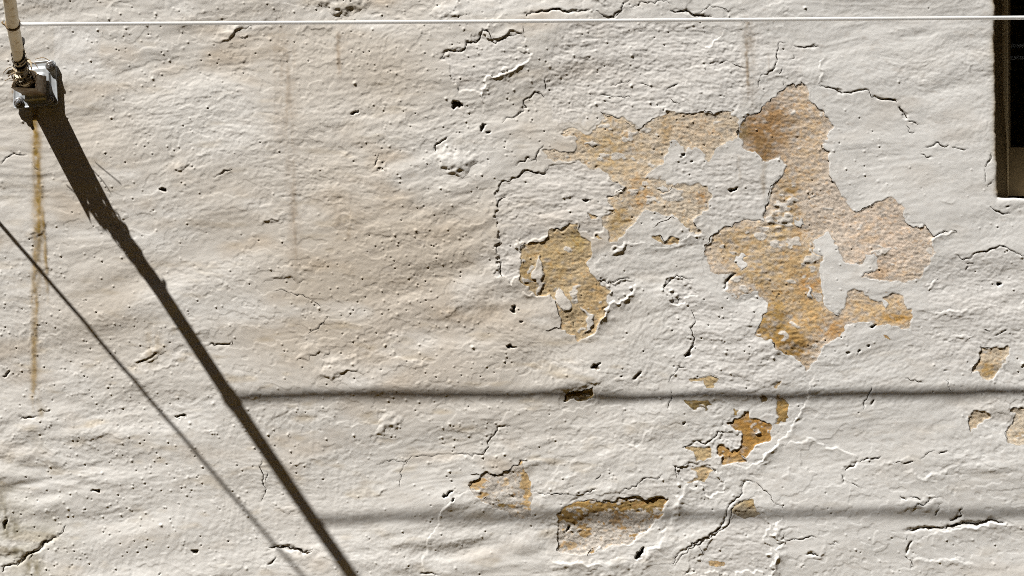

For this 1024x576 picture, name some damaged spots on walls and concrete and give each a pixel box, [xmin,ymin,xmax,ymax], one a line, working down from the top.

crack [441,0,730,58]
crack [821,85,966,158]
rust [33,114,45,233]
peeling [519,82,941,371]
peeling [971,346,1010,380]
peeling [685,382,789,483]
peeling [968,407,1024,445]
crack [2,526,65,572]
peeling [468,459,533,519]
peeling [556,495,668,559]
crack [672,480,783,564]
crack [901,497,1003,567]